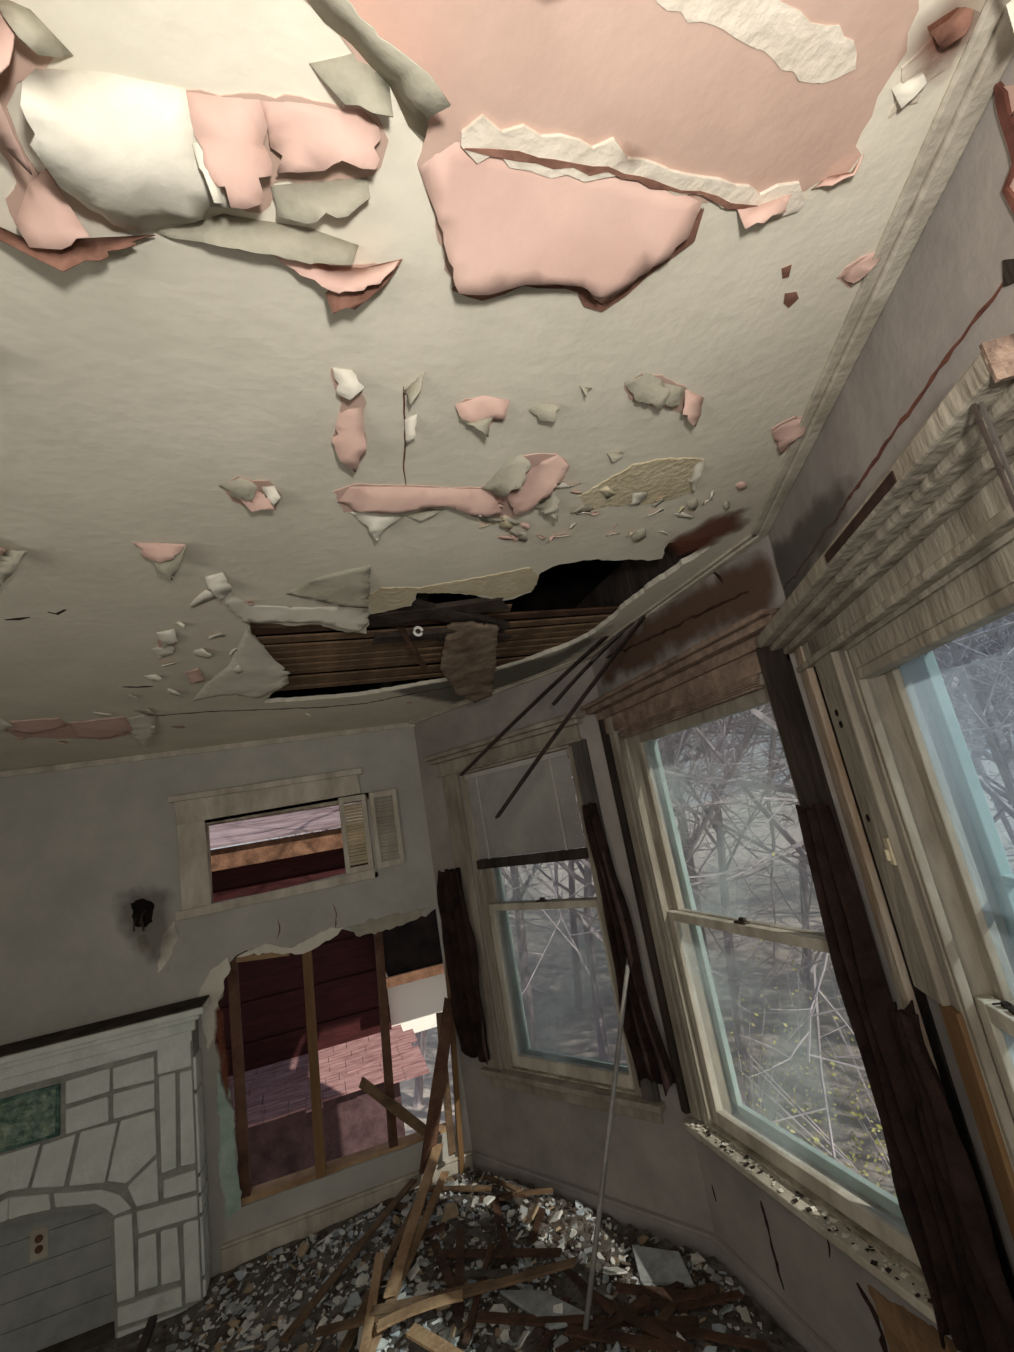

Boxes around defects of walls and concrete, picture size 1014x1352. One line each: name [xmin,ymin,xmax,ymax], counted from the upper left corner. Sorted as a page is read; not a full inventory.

peeling [0,0,980,314]
peeling [994,81,1014,214]
spalling [1002,259,1014,287]
peeling [331,368,730,543]
peeling [0,547,27,587]
peeling [144,566,539,702]
damp [604,491,843,682]
peeling [0,694,157,752]
spalling [198,908,425,1050]
spalling [216,1071,242,1219]
crack [760,1201,784,1290]
spalling [867,1285,959,1352]